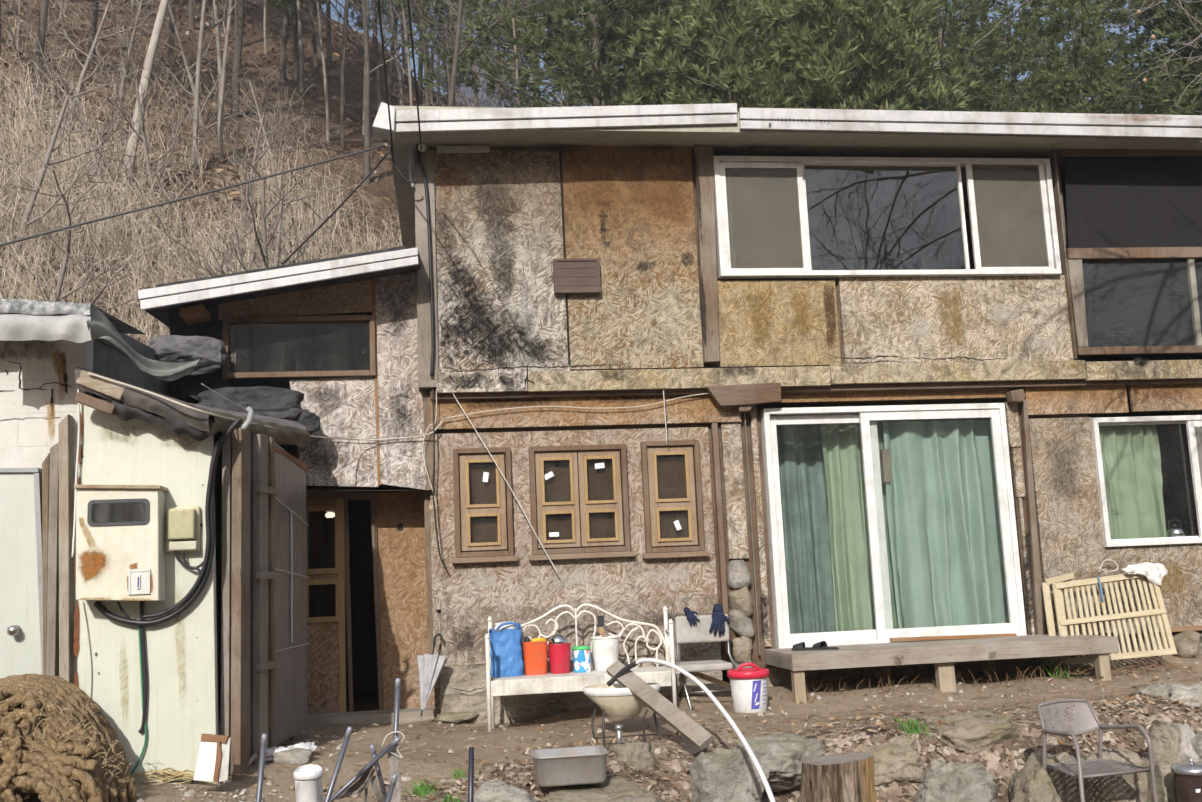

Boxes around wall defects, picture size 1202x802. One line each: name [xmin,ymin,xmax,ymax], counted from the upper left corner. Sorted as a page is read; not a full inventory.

leakage [476,187,514,295]
leakage [440,223,550,408]
crack [0,361,72,421]
leakage [601,395,682,403]
corrosion [75,518,105,582]
corrosion [73,597,104,687]